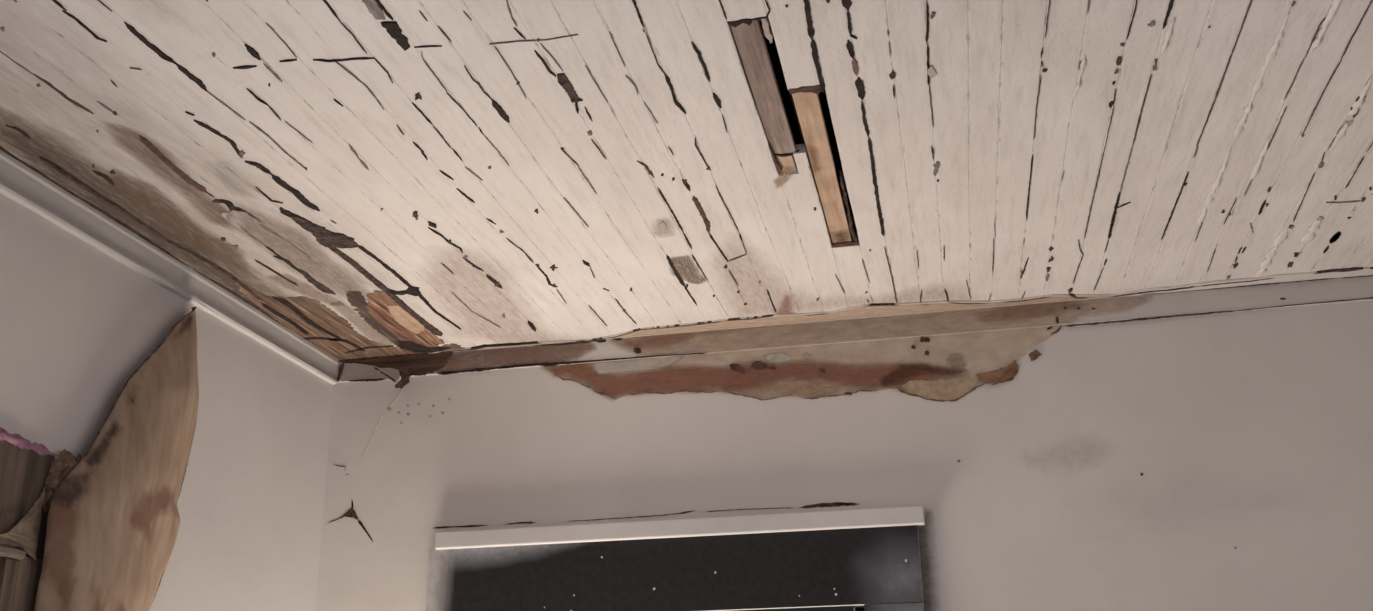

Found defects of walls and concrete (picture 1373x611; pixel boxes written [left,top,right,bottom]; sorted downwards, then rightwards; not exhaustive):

spalling [727,16,773,43]
spalling [789,85,822,95]
spalling [768,140,800,188]
spalling [832,170,859,247]
damp [0,113,393,346]
peeling [671,257,705,284]
peeling [729,361,776,373]
peeling [901,378,979,402]